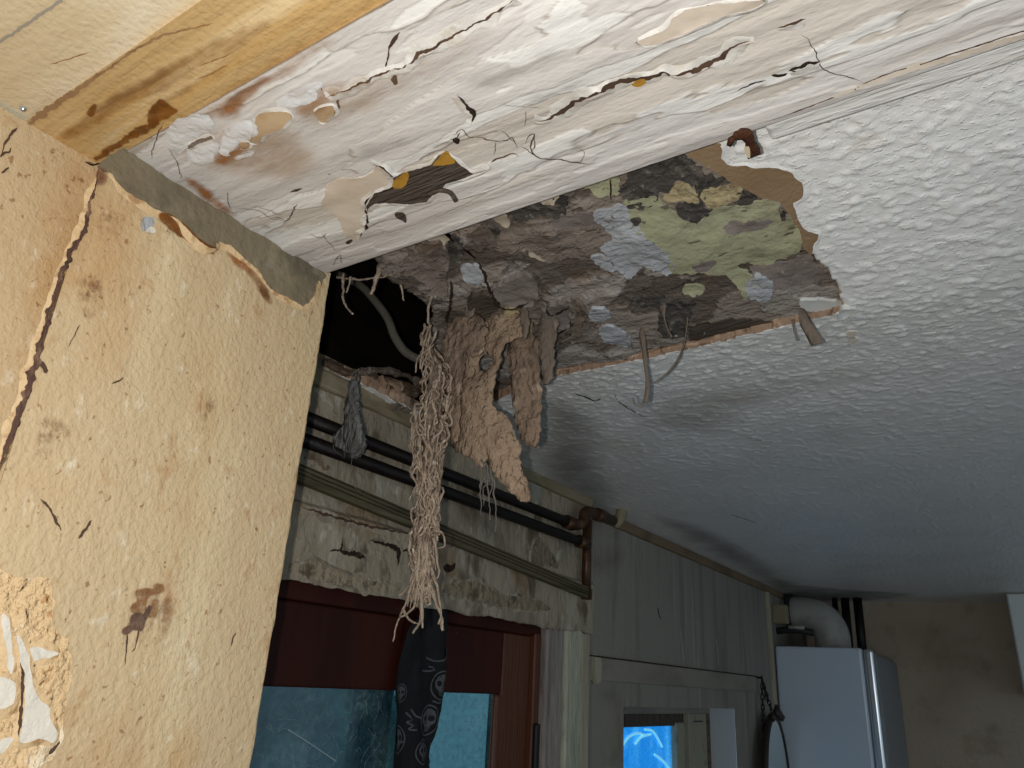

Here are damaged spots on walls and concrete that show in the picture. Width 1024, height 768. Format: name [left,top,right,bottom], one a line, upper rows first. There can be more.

damp [94,100,177,160]
crack [321,0,522,114]
crack [450,19,860,164]
spalling [98,148,326,310]
peeling [321,151,492,244]
peeling [724,218,773,235]
crack [0,162,99,464]
spalling [403,235,688,408]
peeling [745,254,859,346]
peeling [289,556,409,599]
peeling [440,563,550,615]
peeling [0,569,72,768]